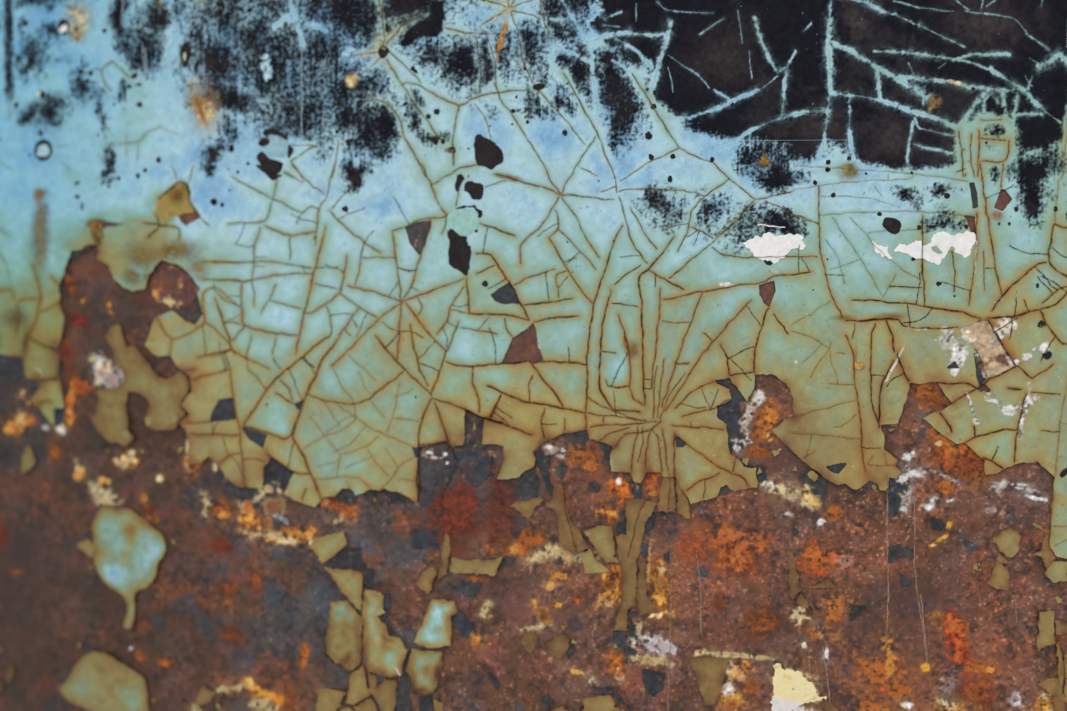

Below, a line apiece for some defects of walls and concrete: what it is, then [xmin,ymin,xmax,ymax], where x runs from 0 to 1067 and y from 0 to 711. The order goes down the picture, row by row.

damp [0,0,72,102]
damp [17,60,107,131]
peeling [432,125,504,170]
damp [108,0,1067,249]
peeling [447,174,484,276]
peeling [877,212,901,234]
corrosion [127,244,203,310]
crack [144,0,1067,556]
corrosion [209,495,317,546]
peeling [0,244,1067,711]
corrosion [596,473,633,523]
corrosion [721,660,758,709]